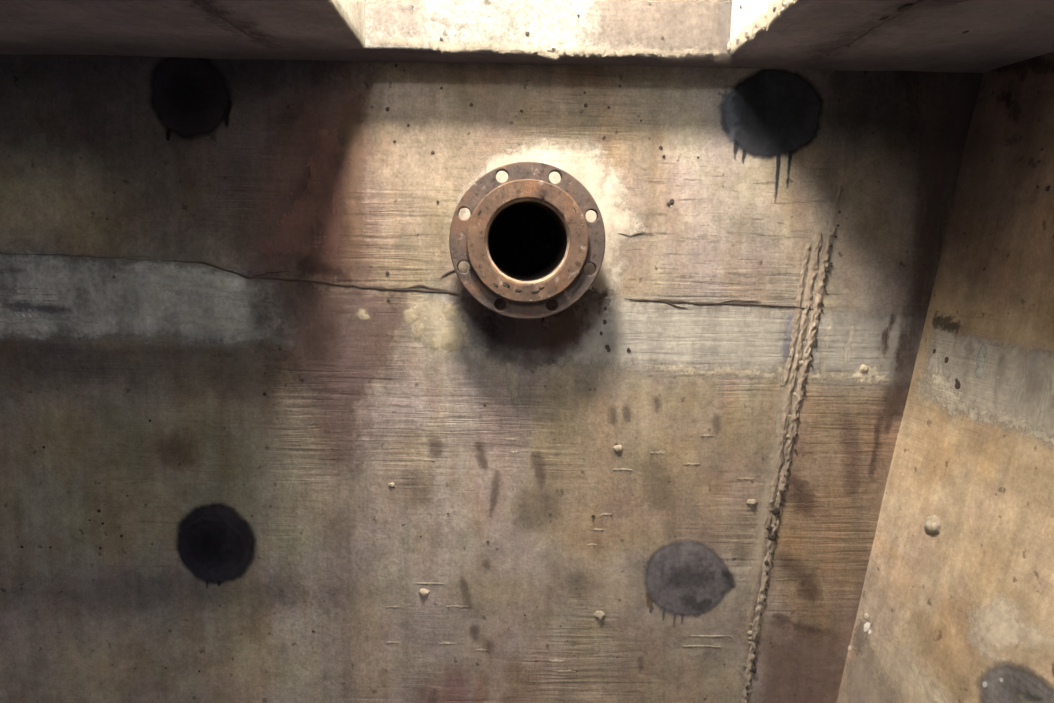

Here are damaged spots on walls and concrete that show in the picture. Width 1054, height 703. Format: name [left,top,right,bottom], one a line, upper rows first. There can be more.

crack [0,252,459,295]
rust [493,282,545,294]
crack [624,298,814,310]
water stain [423,281,794,407]